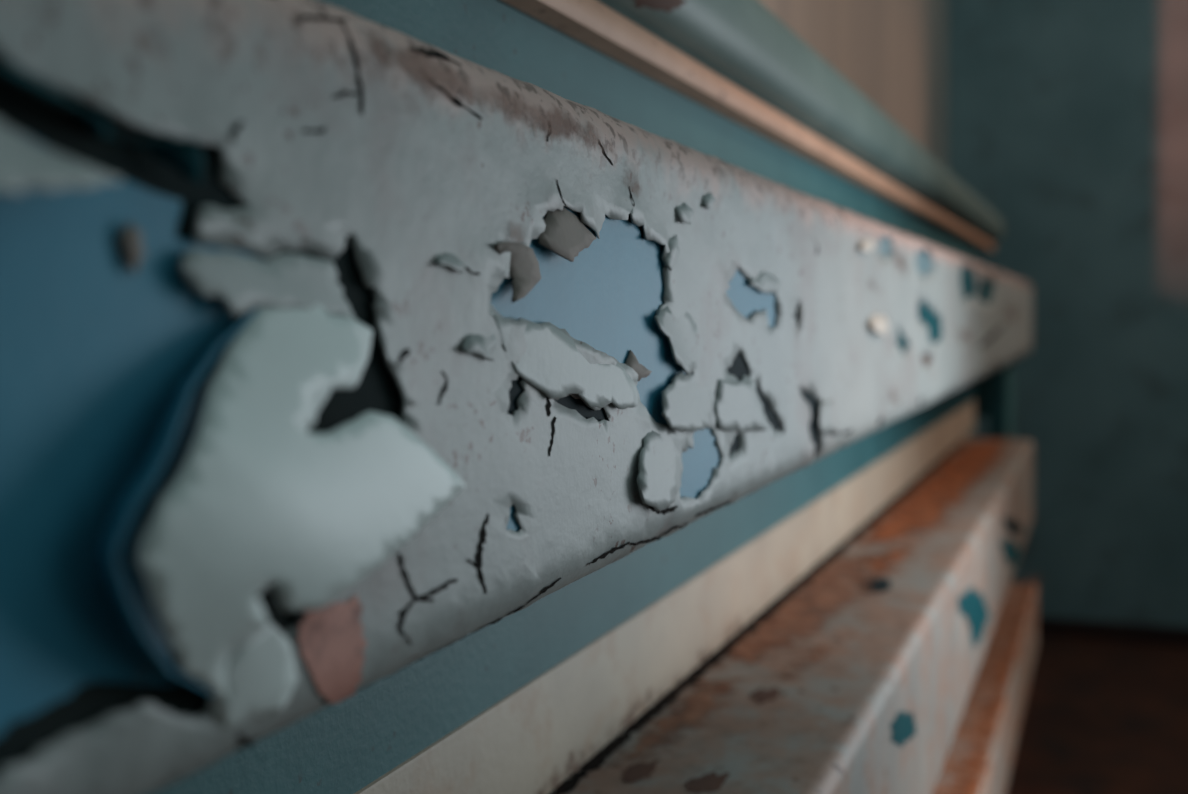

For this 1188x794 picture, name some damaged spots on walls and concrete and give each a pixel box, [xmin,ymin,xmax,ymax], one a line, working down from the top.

crack [296,15,364,116]
crack [408,46,482,119]
peeling [0,58,204,184]
crack [598,139,635,207]
peeling [960,265,994,305]
peeling [0,121,466,734]
crack [398,348,410,364]
crack [437,371,448,405]
crack [546,397,556,456]
peeling [460,192,784,511]
peeling [800,388,846,457]
peeling [917,301,942,366]